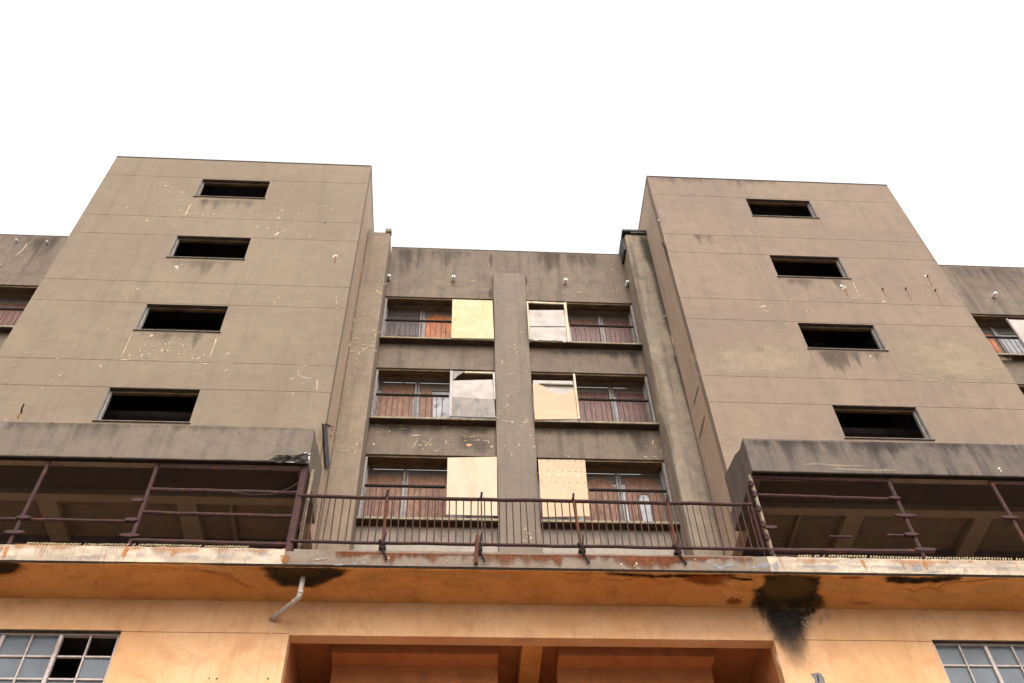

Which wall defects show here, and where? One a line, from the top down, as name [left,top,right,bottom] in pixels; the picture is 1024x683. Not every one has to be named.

peeling [120,332,233,379]
peeling [414,344,536,457]
corrosion [336,551,717,568]
damp [0,562,24,580]
damp [264,566,345,587]
damp [886,575,1004,592]
damp [608,559,825,650]